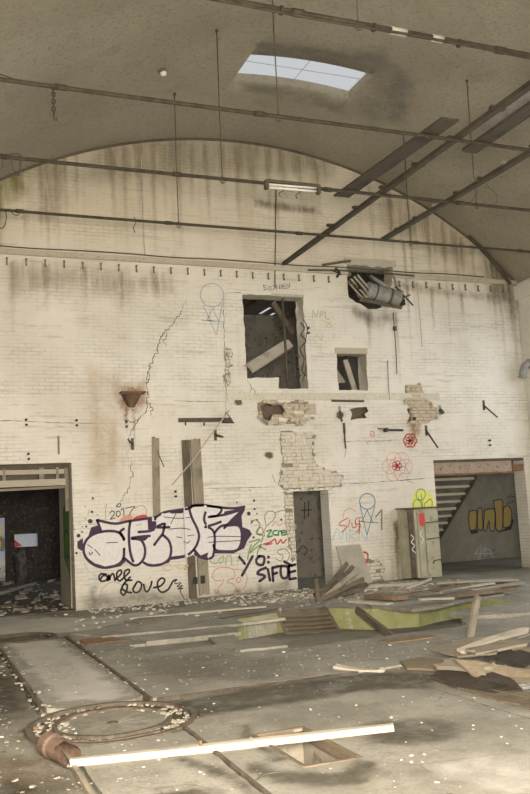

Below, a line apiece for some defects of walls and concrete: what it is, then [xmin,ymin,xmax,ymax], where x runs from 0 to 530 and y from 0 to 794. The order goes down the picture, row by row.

crack [117,302,186,506]
crack [175,291,240,402]
peeling [222,346,233,388]
spalling [403,383,438,424]
peeling [255,400,344,562]